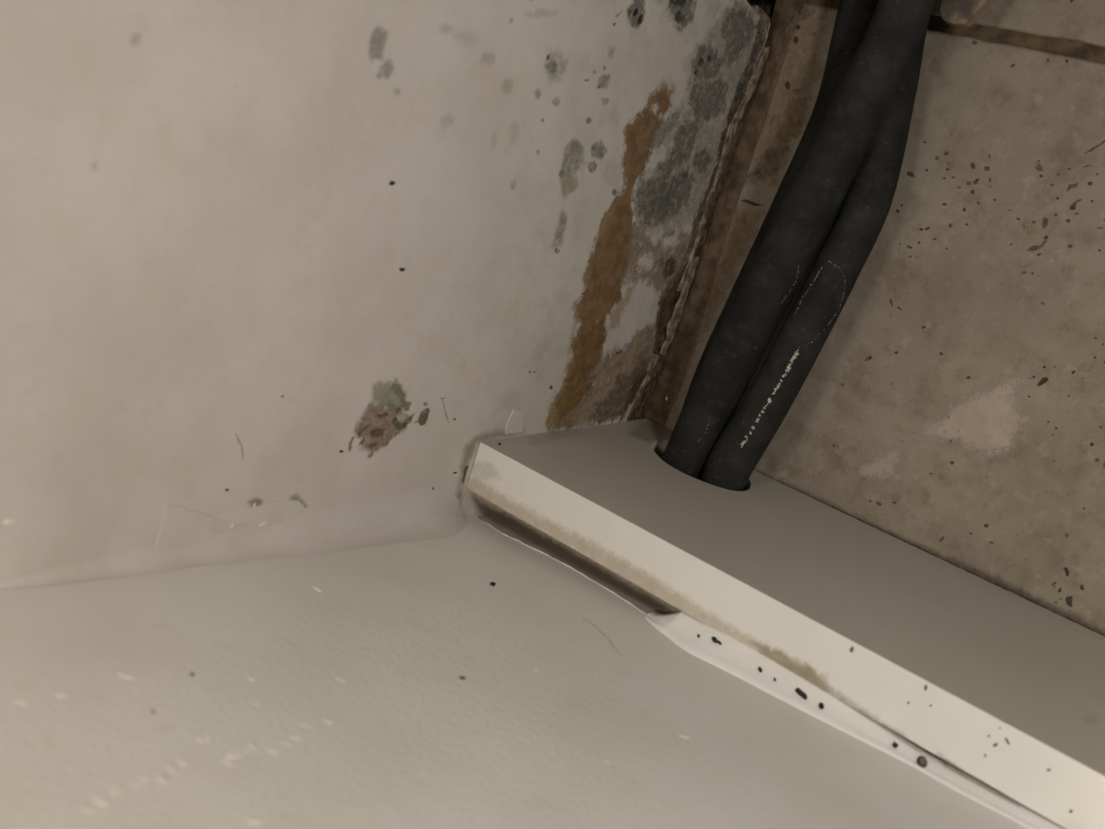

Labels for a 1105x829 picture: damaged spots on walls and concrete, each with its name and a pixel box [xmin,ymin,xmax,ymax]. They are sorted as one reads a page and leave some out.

damp [627,0,645,28]
damp [669,0,697,30]
rust [546,86,672,431]
damp [557,5,756,429]